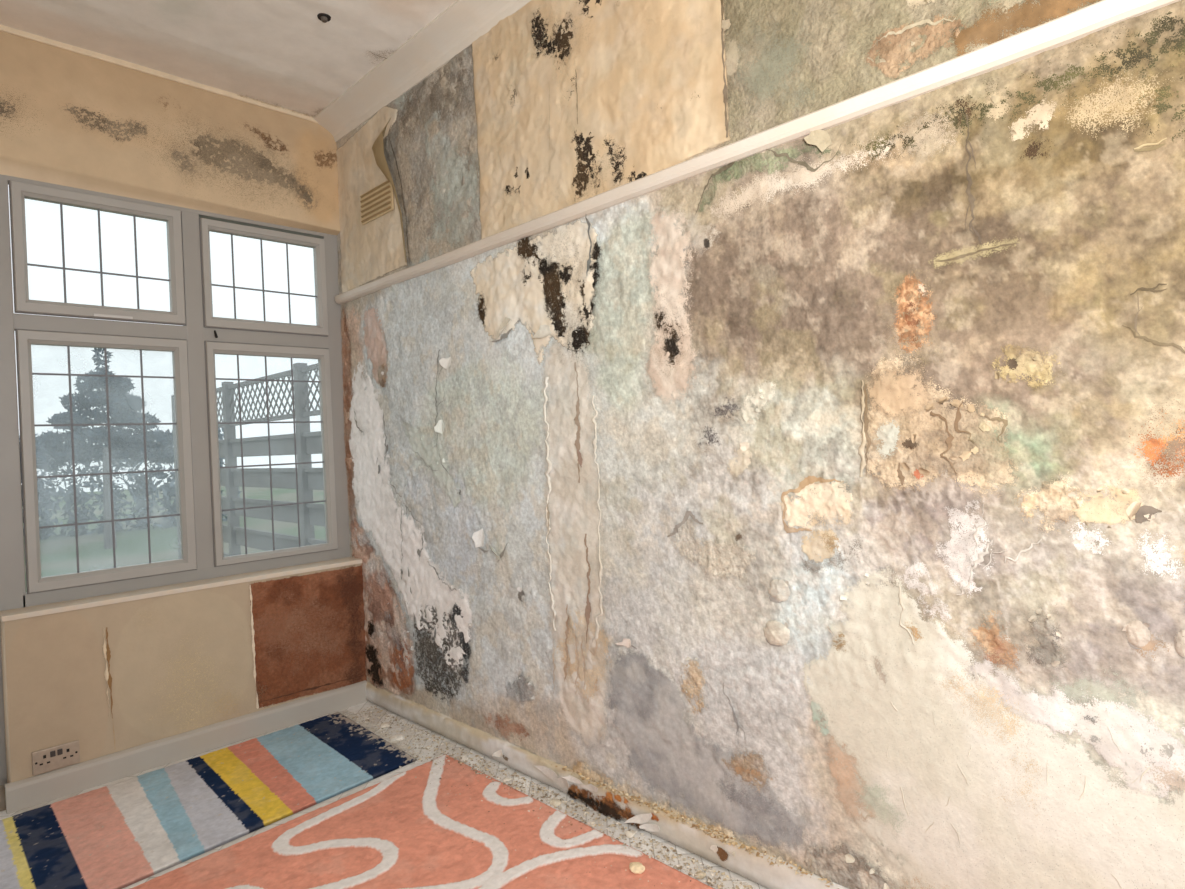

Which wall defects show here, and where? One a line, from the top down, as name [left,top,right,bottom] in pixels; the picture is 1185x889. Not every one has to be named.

water stain [59,97,338,222]
water stain [468,0,661,233]
flaking render [717,0,1102,148]
water stain [846,0,1185,168]
flaking render [642,90,962,406]
rust [880,263,960,370]
peeling [242,306,474,709]
spalling [856,354,1162,536]
rust [1118,394,1185,501]
crack [103,627,115,745]
water stain [411,604,474,706]
flaking render [555,476,1185,889]